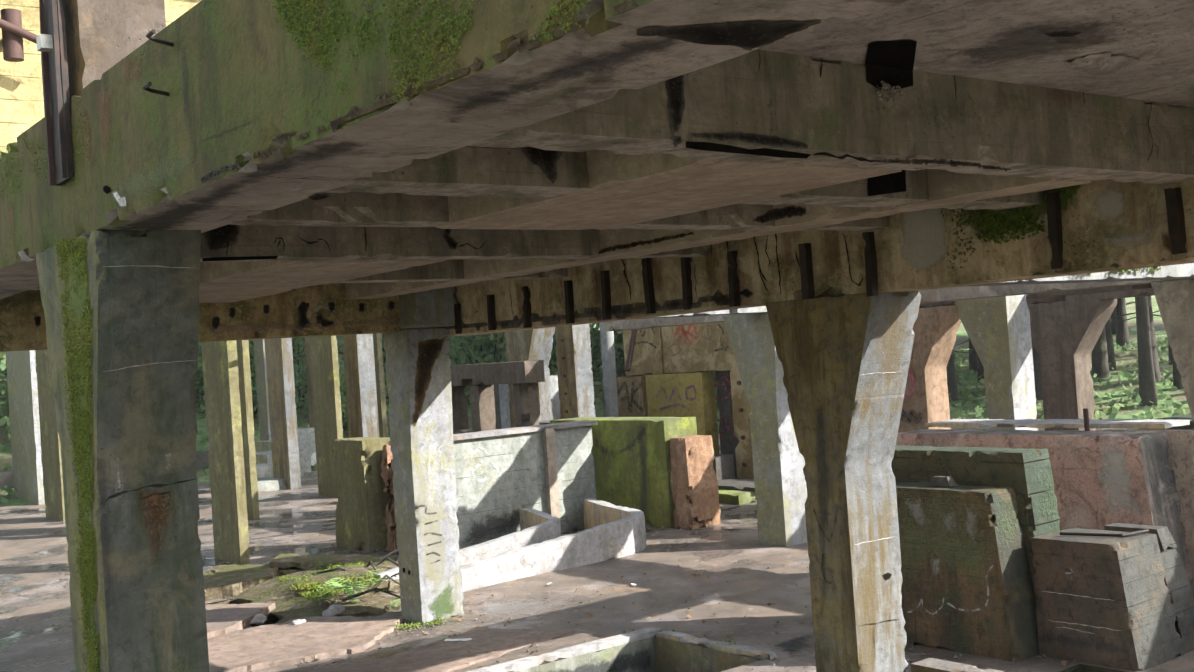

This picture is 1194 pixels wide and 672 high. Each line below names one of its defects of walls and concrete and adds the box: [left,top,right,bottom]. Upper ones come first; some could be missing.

damp [966,23,1110,63]
crack [814,152,875,162]
peeling [103,185,126,206]
crack [273,237,330,250]
crack [711,234,800,294]
spalling [412,288,753,427]
crack [105,478,197,509]